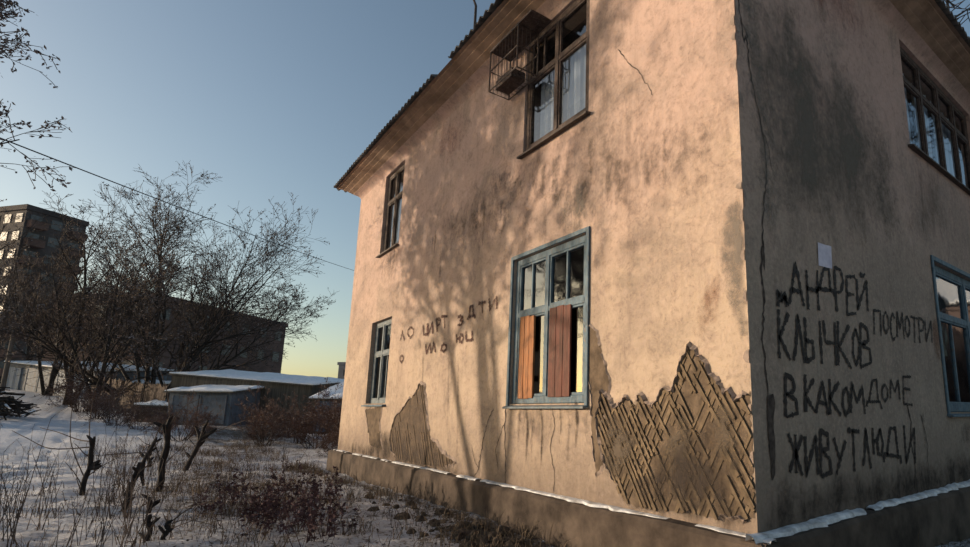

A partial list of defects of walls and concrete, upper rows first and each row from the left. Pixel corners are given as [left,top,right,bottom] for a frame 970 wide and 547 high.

spalling [730,0,740,71]
spalling [735,181,749,230]
flaking render [584,323,756,525]
flaking render [767,394,775,481]